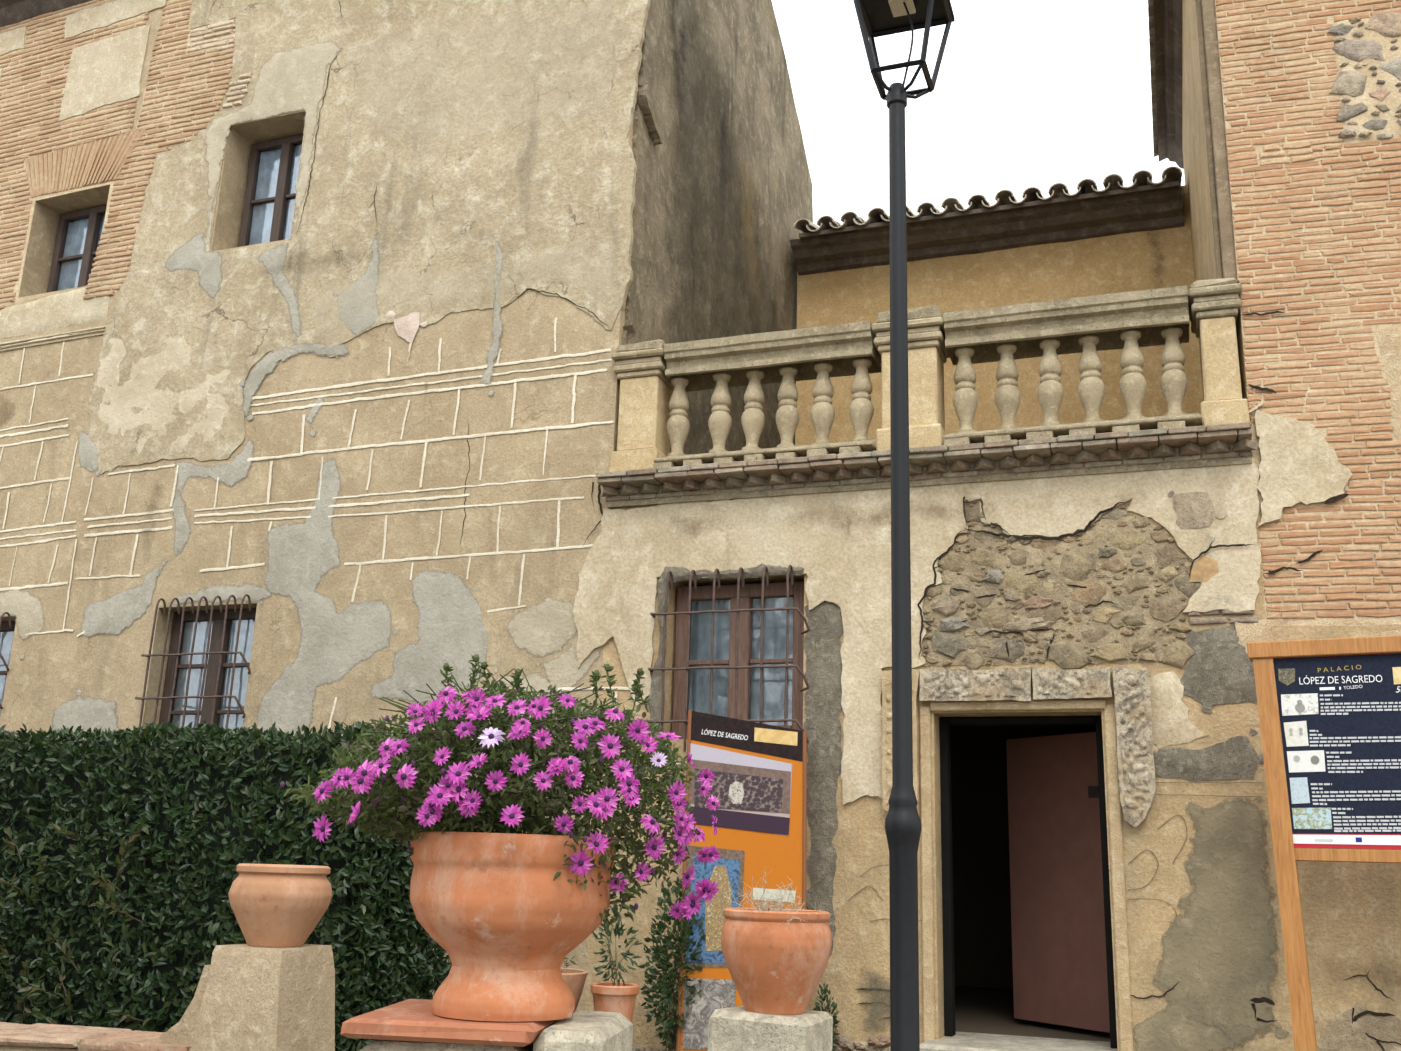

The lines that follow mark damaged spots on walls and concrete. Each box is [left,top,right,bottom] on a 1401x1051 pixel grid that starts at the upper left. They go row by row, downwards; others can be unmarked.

crack [508,288,608,326]
peeling [89,334,245,455]
spalling [1153,729,1264,782]
spalling [1133,797,1289,1051]